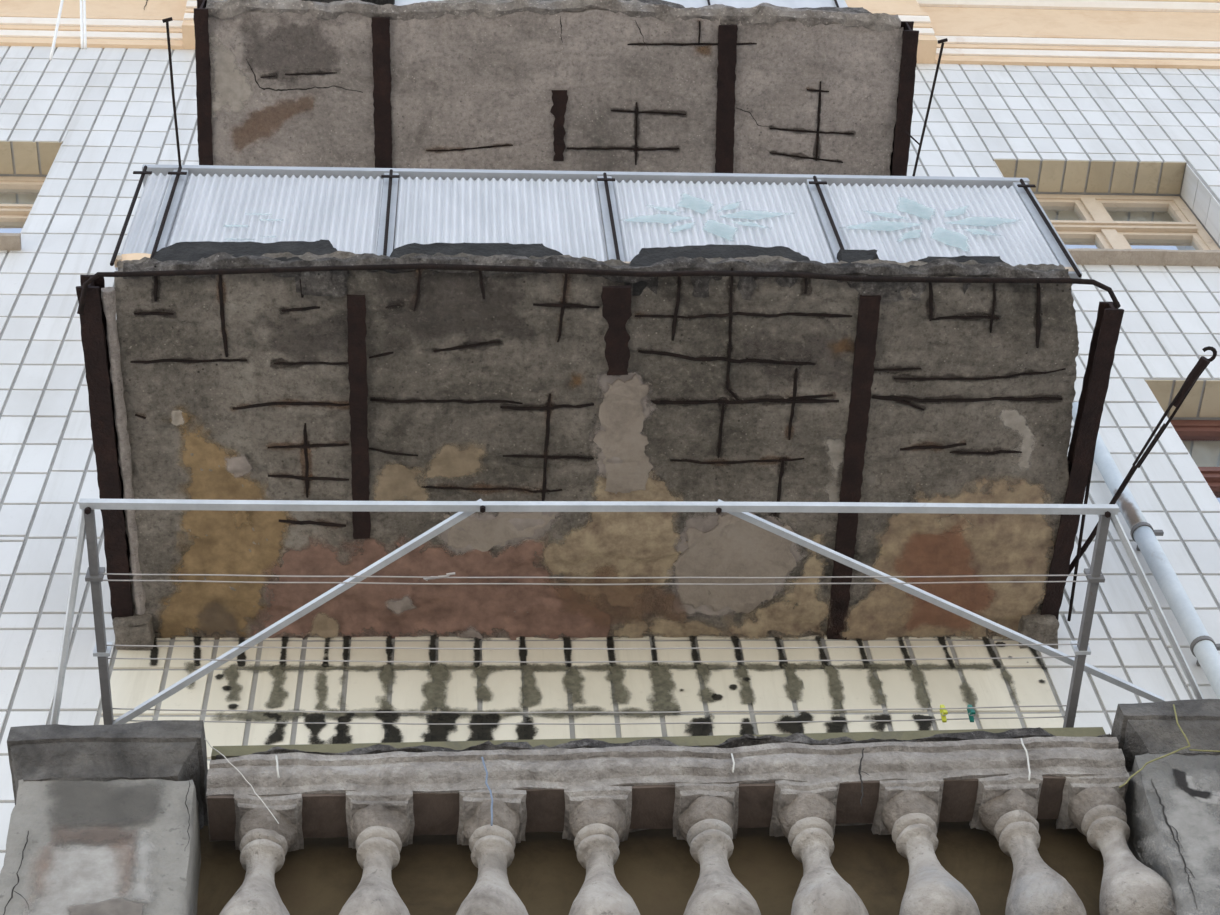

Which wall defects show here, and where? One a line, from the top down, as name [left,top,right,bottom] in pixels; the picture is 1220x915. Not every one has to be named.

spalling [206,0,900,46]
spalling [261,71,337,79]
spalling [426,144,513,153]
spalling [567,102,687,165]
spalling [769,81,855,163]
peeling [77,252,1121,641]
water stain [150,637,159,666]
water stain [186,636,202,688]
water stain [215,527,1016,745]
water stain [1027,647,1047,683]
crack [3,831,29,915]
crack [1151,779,1197,908]